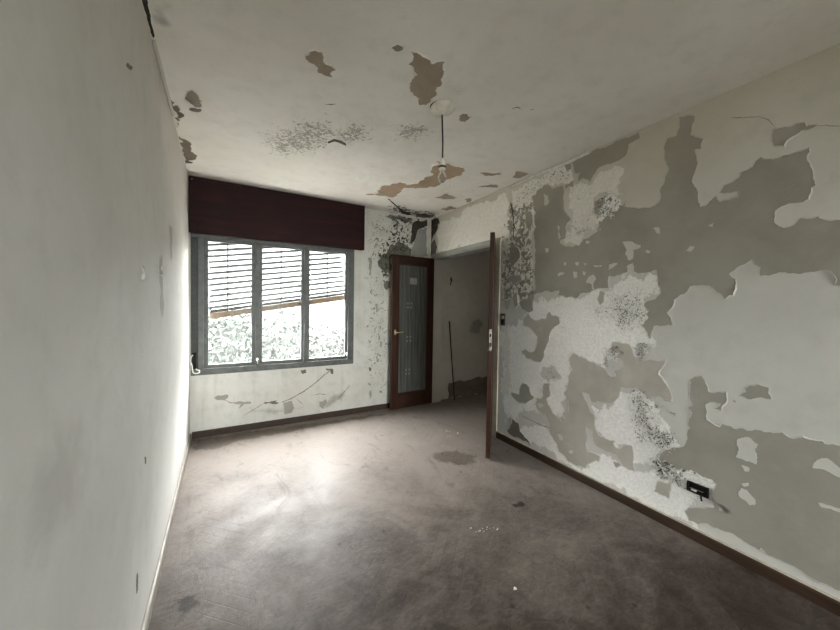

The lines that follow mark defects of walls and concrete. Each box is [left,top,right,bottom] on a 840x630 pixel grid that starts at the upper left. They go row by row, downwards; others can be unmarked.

peeling [304,49,336,78]
peeling [390,43,446,106]
peeling [171,89,203,164]
damp [597,189,626,219]
peeling [360,163,472,400]
peeling [500,114,840,592]
peeling [264,399,295,415]
damp [499,273,715,529]